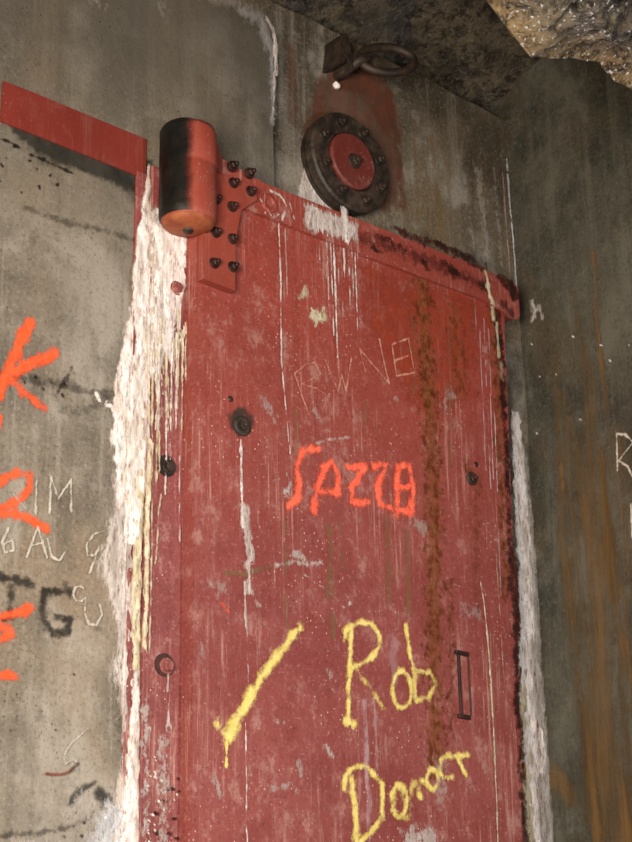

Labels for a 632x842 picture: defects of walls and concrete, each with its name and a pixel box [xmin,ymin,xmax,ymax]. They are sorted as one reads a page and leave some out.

water stain [12,127,135,191]
water stain [88,160,187,842]
corrosion [411,276,456,780]
peeling [391,226,487,281]
corrosion [487,305,512,604]
peeling [494,273,529,842]
water stain [511,411,546,842]